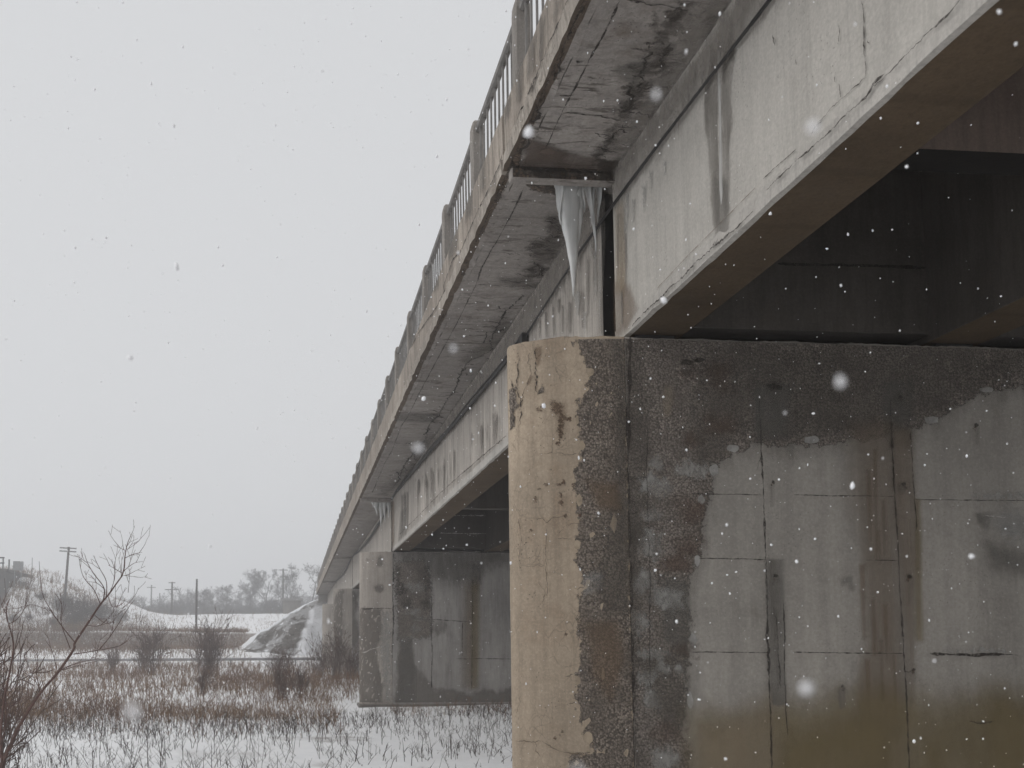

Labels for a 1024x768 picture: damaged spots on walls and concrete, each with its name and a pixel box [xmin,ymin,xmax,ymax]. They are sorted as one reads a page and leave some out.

water stain [396,639,511,702]
crack [373,152,559,525]
crack [517,0,568,119]
water stain [401,0,761,526]
crack [546,0,686,158]
spalling [509,339,1024,768]
crack [626,0,960,767]
water stain [765,603,940,768]
crack [795,400,1024,768]
water stain [985,698,1024,768]